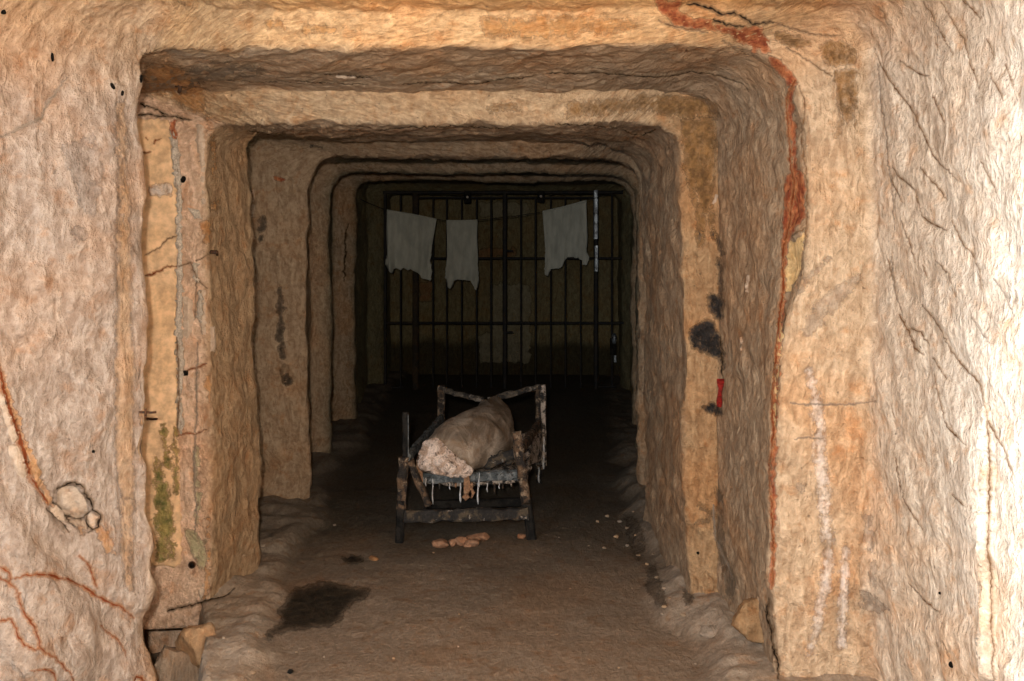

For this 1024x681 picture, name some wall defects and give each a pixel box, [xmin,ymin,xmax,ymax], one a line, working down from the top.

corrosion [655,0,808,277]
crack [924,0,1013,100]
crack [0,369,133,681]
leakage [159,423,180,496]
leakage [265,580,370,640]
crack [661,3,873,677]
corrosion [768,291,787,590]
crack [877,58,1013,681]